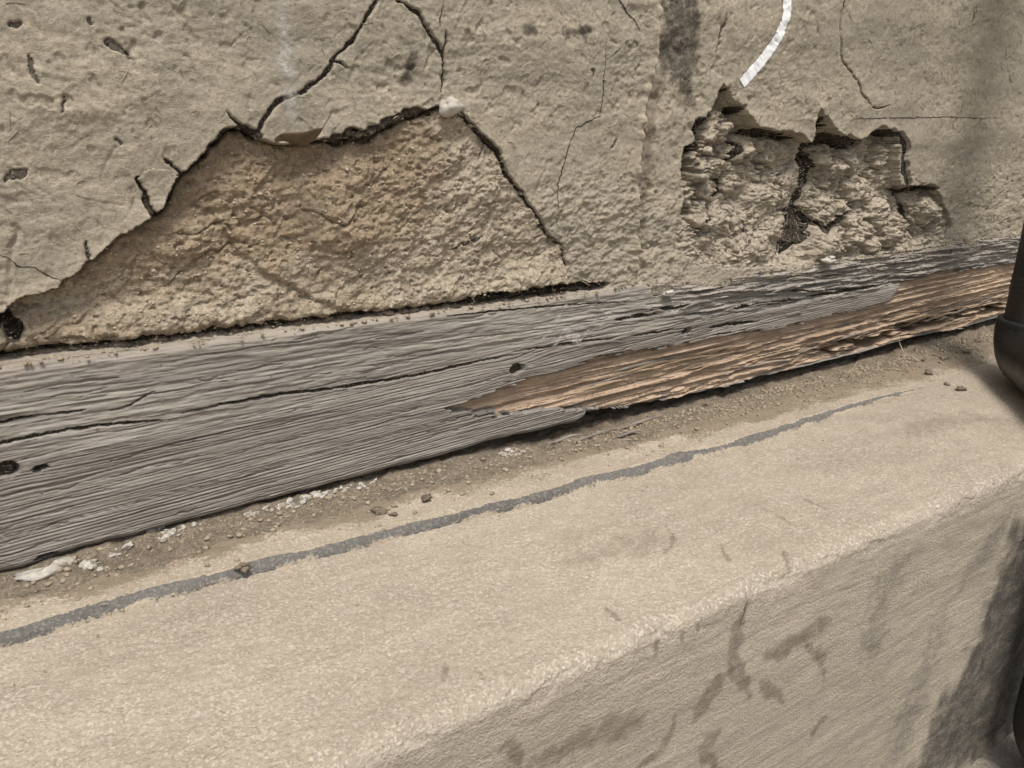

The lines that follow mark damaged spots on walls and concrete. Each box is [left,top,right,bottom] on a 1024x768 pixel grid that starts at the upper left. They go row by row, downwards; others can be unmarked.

crack [135,0,446,216]
spalling [0,96,605,356]
crack [460,0,640,265]
leakage [659,0,700,102]
spalling [674,92,947,269]
crack [682,0,1002,245]